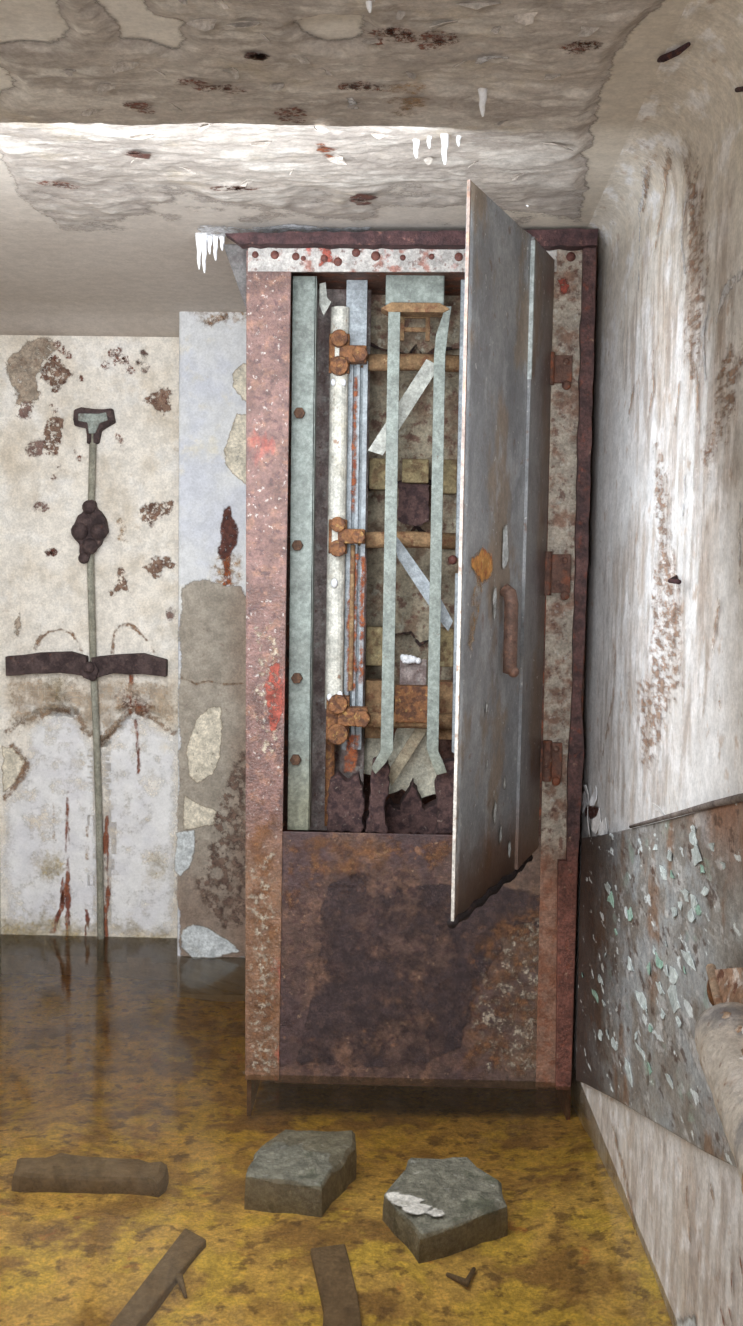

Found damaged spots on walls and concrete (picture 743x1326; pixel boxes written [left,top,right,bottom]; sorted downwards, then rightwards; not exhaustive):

spalling [657,42,691,63]
spalling [0,0,665,232]
spalling [6,338,73,419]
spalling [145,388,172,416]
spalling [25,417,64,457]
spalling [140,500,173,527]
spalling [110,567,128,596]
spalling [142,556,175,579]
corrosion [214,506,240,586]
spalling [166,579,246,960]
corrosion [86,816,109,867]
corrosion [53,862,111,939]